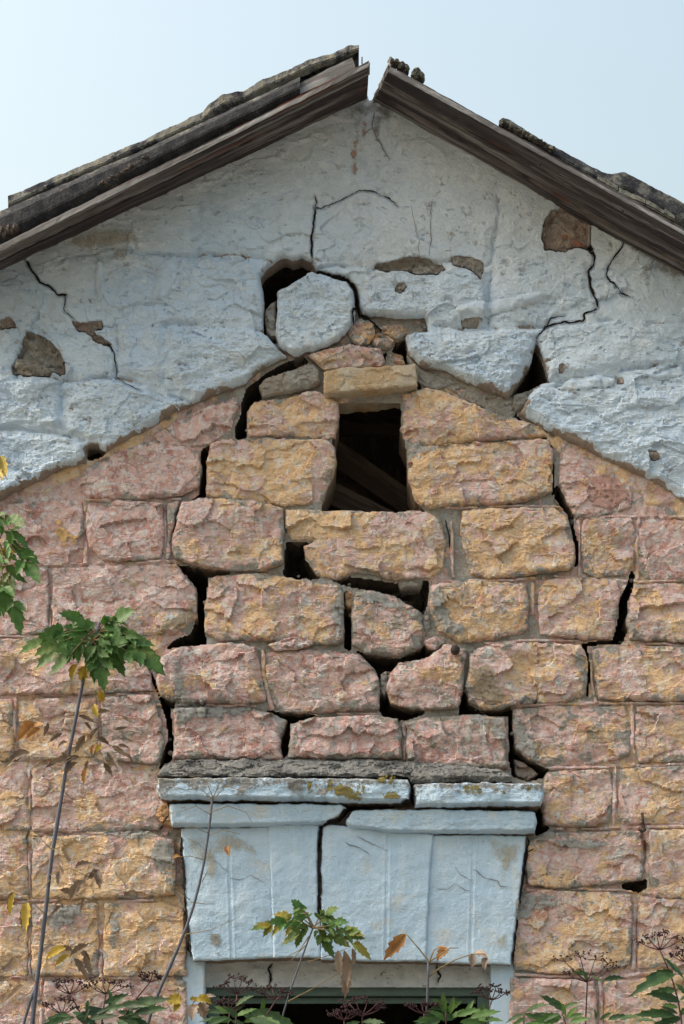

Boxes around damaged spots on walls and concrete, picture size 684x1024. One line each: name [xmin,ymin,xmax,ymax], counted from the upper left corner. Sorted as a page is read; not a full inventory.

spalling [12,332,65,376]
spalling [74,321,109,346]
crack [235,190,432,440]
spalling [376,257,483,293]
spalling [543,208,592,254]
crack [513,242,630,420]
crack [167,565,208,649]
crack [283,543,429,722]
crack [581,571,635,696]
crack [151,673,174,770]
crack [459,688,548,780]
crack [317,787,414,914]